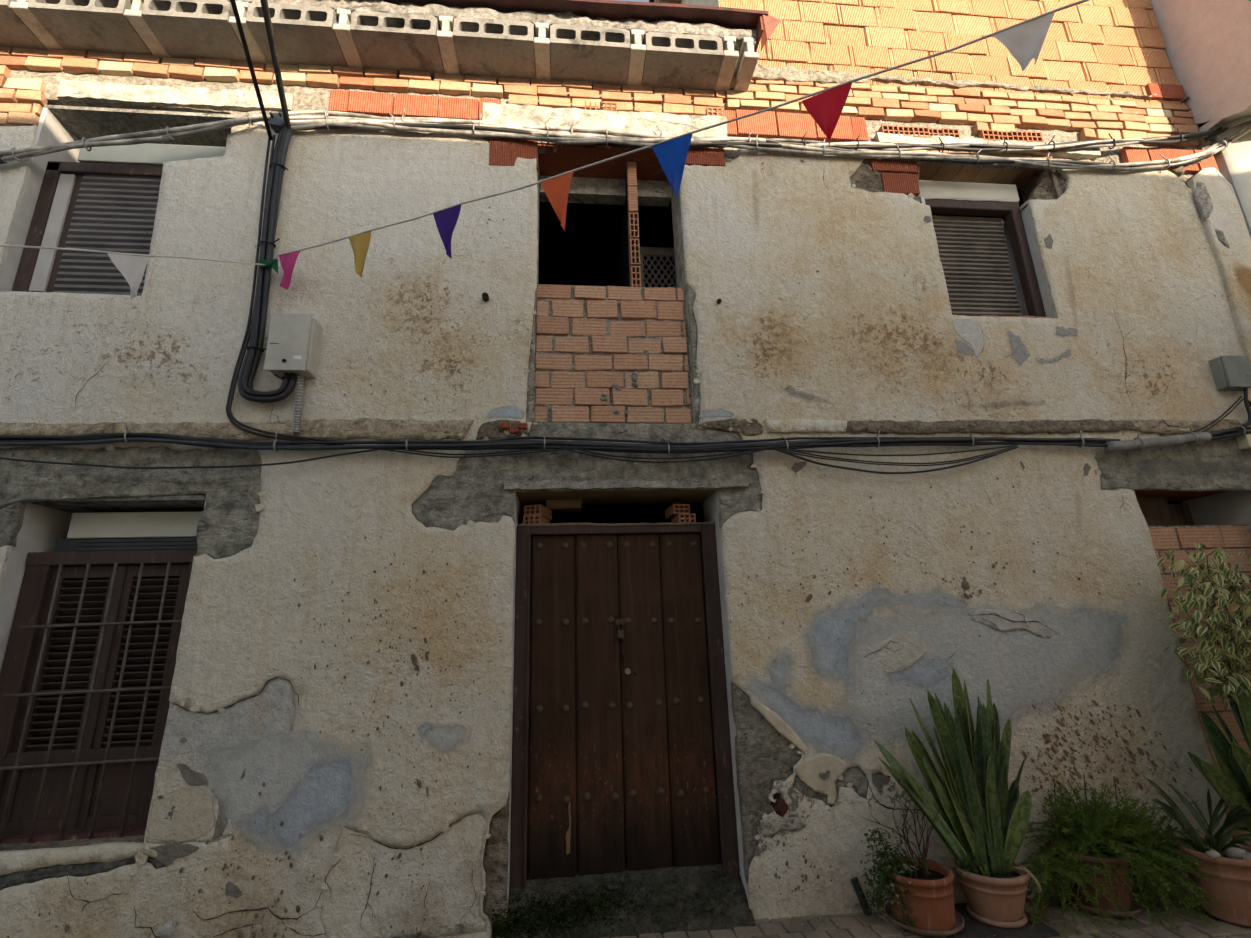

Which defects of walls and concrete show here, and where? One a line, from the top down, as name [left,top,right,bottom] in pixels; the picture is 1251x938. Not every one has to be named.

peeling [952,319,1005,379]
peeling [1008,327,1077,365]
crack [966,610,1075,636]
peeling [731,590,1122,885]
peeling [0,677,510,938]
crack [67,813,478,938]